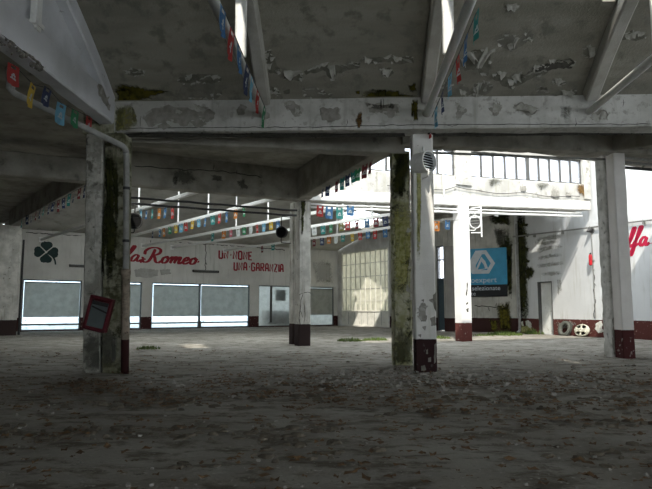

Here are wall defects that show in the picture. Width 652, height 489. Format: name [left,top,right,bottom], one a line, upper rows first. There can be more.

damp [115,89,131,100]
spalling [124,73,405,139]
peeling [265,49,414,99]
peeling [441,32,577,121]
damp [392,154,410,199]
damp [101,158,119,276]